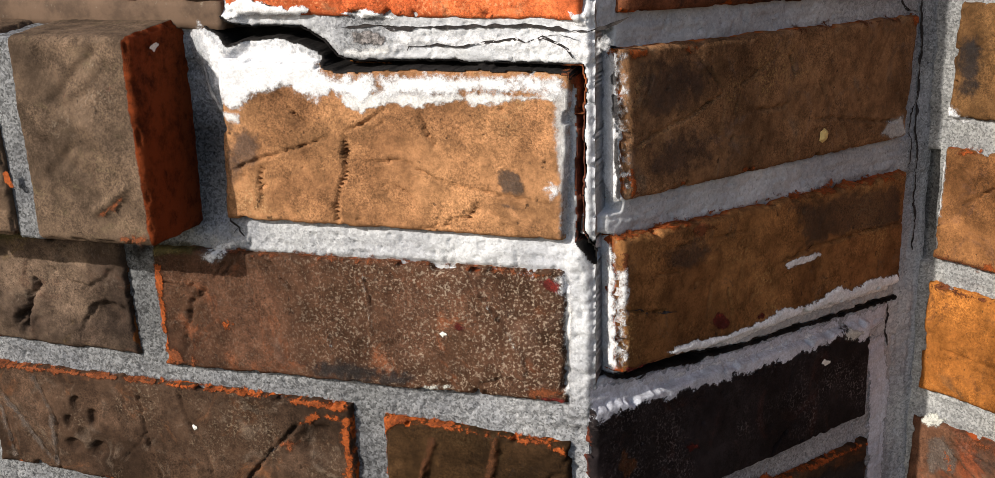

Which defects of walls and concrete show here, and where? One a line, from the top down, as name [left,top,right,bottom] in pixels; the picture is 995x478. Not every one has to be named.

crack [204,1,629,264]
crack [901,0,924,250]
crack [599,294,897,380]